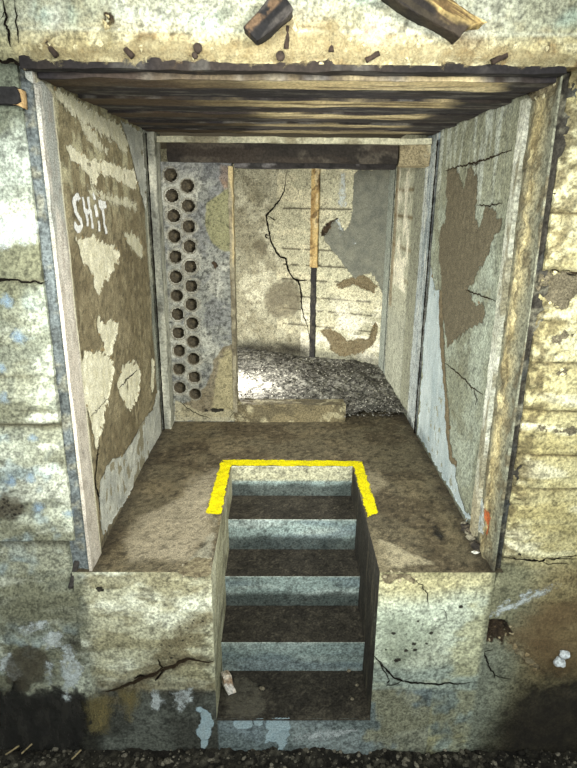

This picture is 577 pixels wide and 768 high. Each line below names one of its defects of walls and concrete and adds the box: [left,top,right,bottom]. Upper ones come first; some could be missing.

flaking render [46,83,147,211]
crack [0,277,48,285]
flaking render [76,234,120,294]
crack [265,172,309,333]
spalling [320,322,378,357]
flaking render [82,316,141,450]
peeling [99,358,163,535]
crack [499,554,577,565]
leakage [0,621,109,753]
crack [106,658,214,692]
crack [372,654,471,686]
leakage [479,677,577,754]